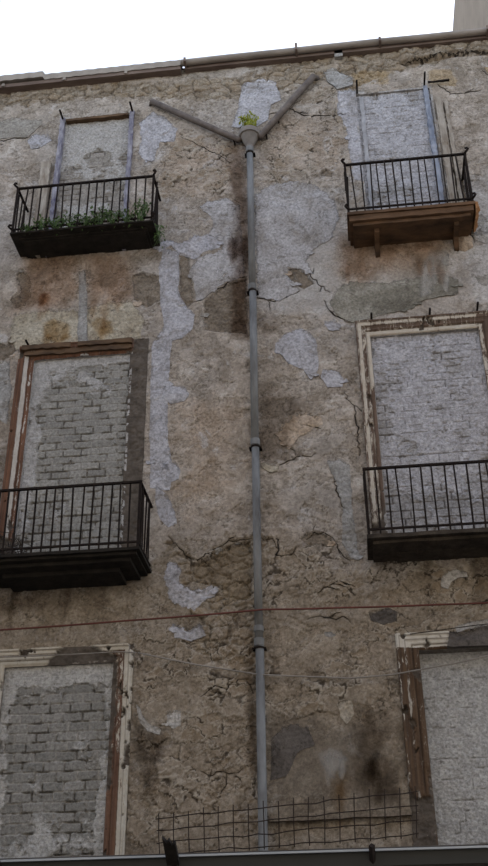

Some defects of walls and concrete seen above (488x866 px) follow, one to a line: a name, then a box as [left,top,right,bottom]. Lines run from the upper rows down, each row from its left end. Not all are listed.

peeling [231,79,281,129]
peeling [138,112,178,163]
peeling [274,328,349,388]
crack [344,392,361,455]
crack [173,525,351,567]
peeling [163,562,219,611]
peeling [169,624,206,642]